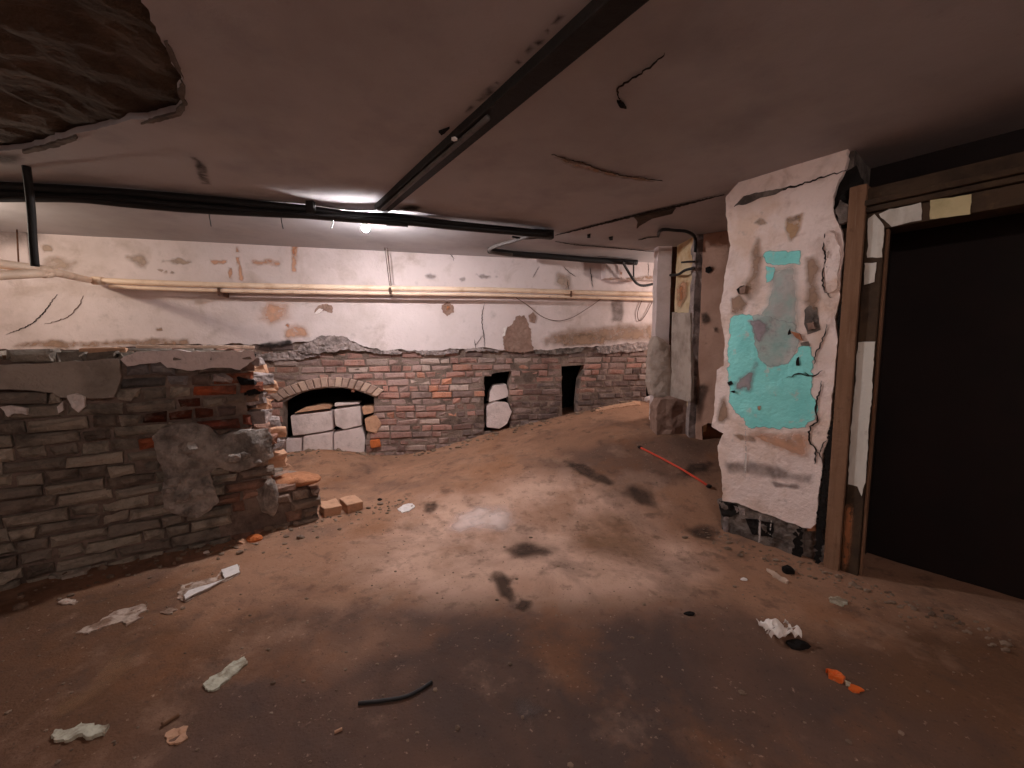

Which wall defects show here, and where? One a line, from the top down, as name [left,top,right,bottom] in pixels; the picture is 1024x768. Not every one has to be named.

spalling [0,0,188,154]
crack [616,53,665,107]
crack [552,154,662,181]
crack [782,169,848,191]
crack [10,295,83,333]
peeling [314,304,333,314]
peeling [727,251,821,430]
peeling [0,405,29,417]
peeling [57,393,87,413]
spalling [212,312,649,468]
crack [786,234,842,564]
spalling [717,498,816,556]